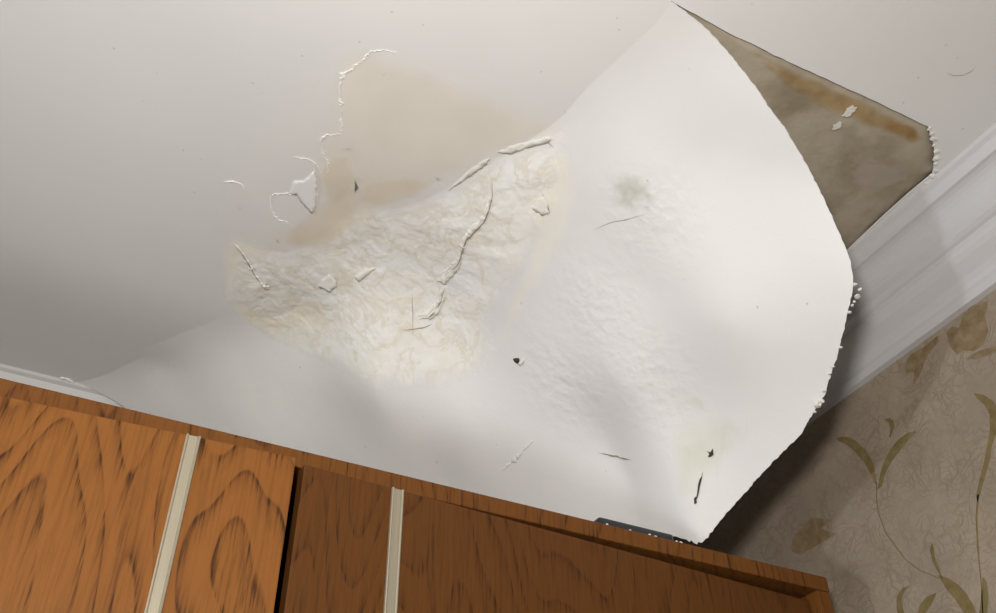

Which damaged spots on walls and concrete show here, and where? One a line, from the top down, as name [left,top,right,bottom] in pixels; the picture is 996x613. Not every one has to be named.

peeling [270,49,397,223]
peeling [675,3,940,249]
flaking render [225,131,571,397]